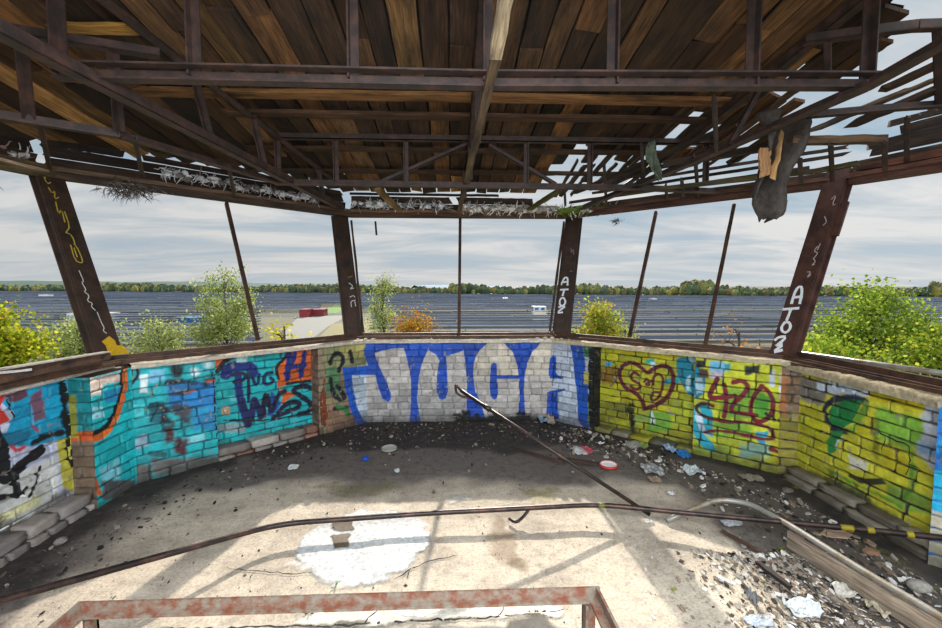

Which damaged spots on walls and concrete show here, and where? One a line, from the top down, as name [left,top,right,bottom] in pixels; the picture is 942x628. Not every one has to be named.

crack [167,607,563,628]